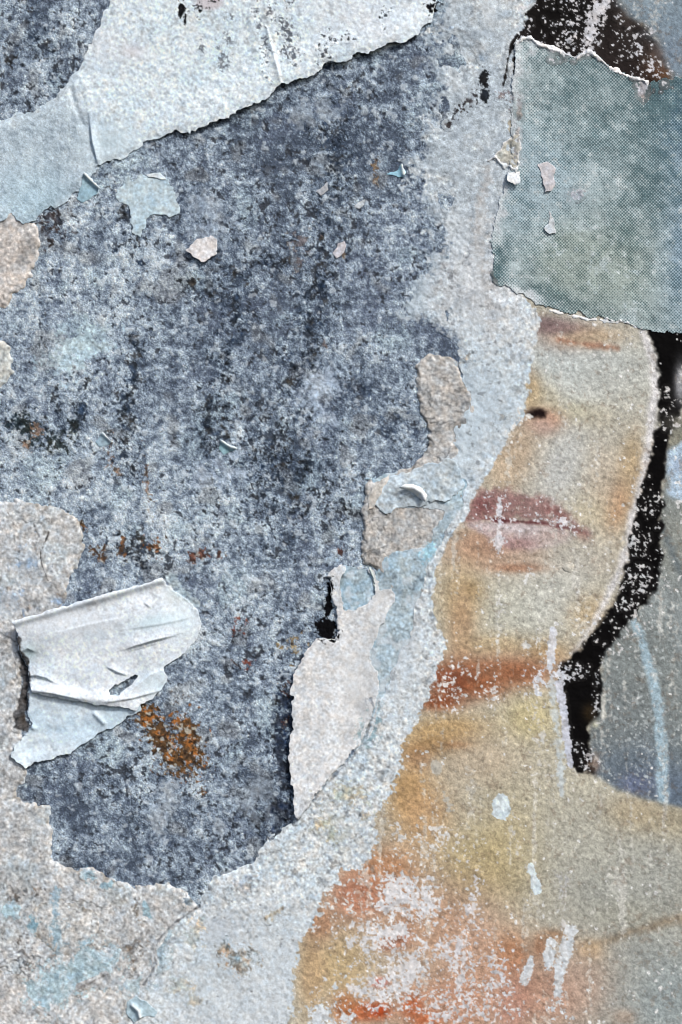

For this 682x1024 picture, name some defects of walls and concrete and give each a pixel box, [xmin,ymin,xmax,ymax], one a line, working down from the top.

peeling [513,0,678,94]
peeling [186,235,217,262]
peeling [333,241,346,259]
peeling [653,383,682,436]
peeling [367,474,390,511]
peeling [417,469,682,801]
rust [126,690,218,799]